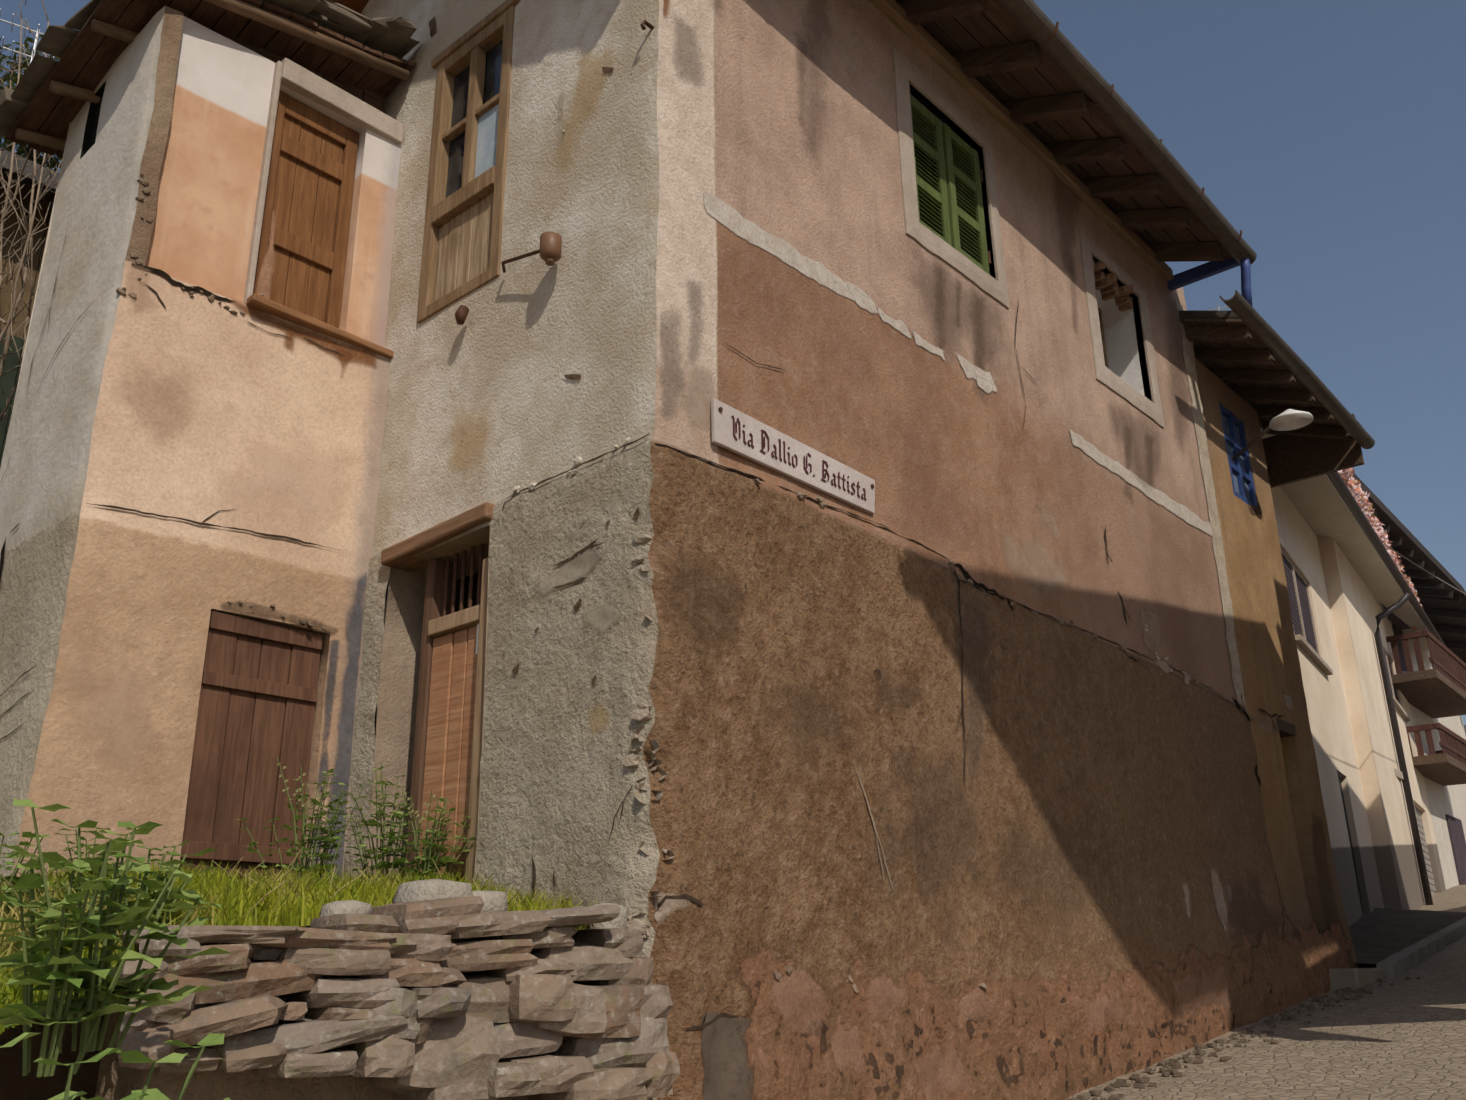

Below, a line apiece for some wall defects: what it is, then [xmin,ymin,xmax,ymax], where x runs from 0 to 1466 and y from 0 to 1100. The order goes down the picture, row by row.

crack [131,263,344,356]
crack [87,503,339,550]
spalling [633,508,653,544]
crack [498,433,1284,794]
spalling [625,704,668,804]
spalling [626,891,679,936]